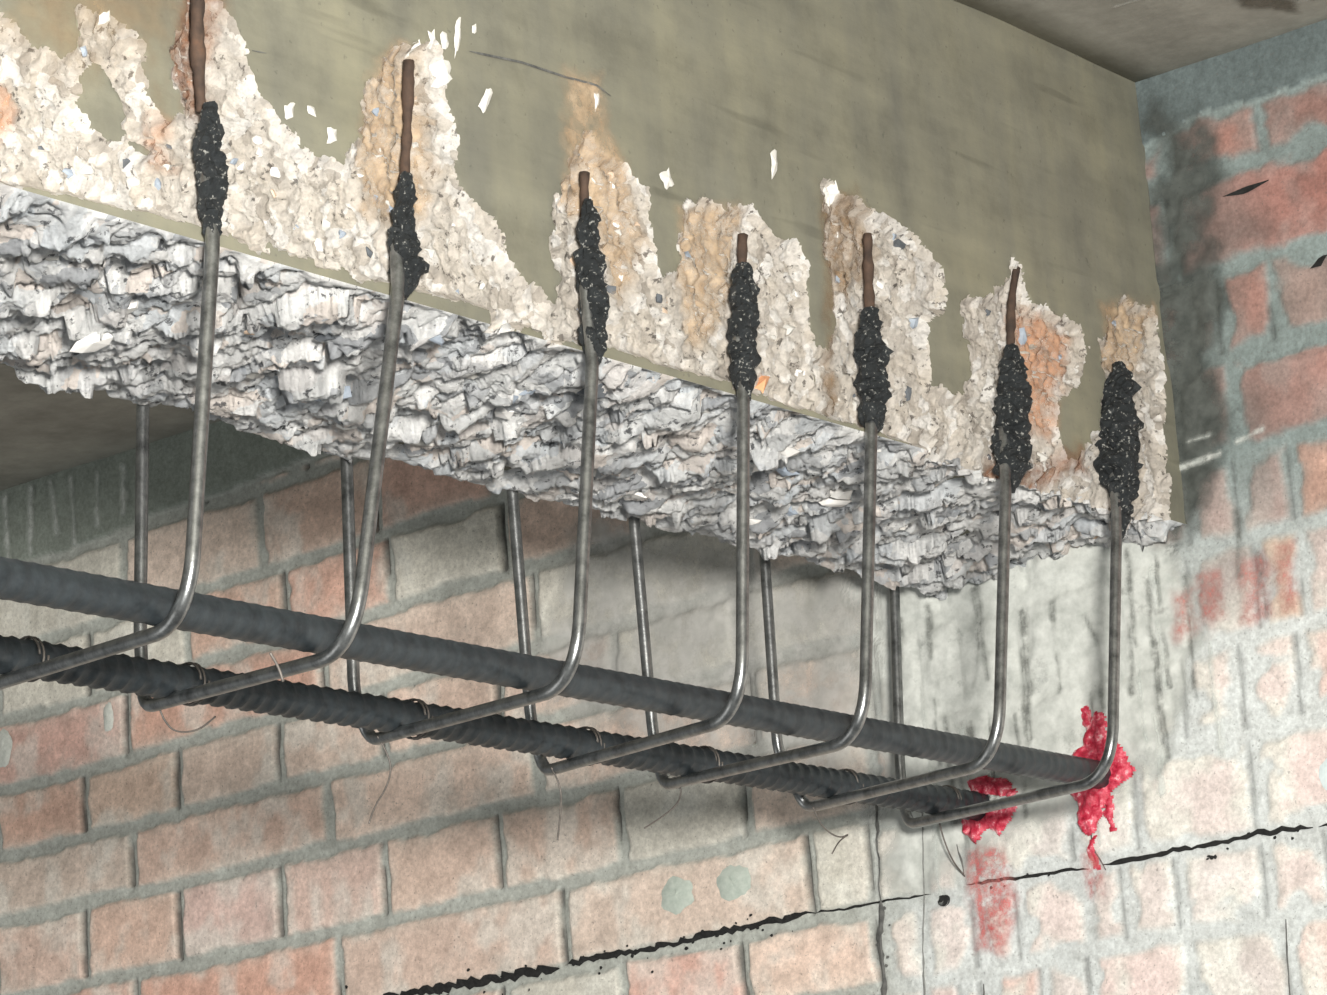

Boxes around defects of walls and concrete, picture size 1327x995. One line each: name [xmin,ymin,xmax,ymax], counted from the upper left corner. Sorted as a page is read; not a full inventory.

corrosion [172,0,210,106]
corrosion [560,81,634,293]
corrosion [680,210,739,337]
corrosion [1015,320,1065,433]
water stain [1146,107,1243,537]
spalling [0,0,1187,877]
corrosion [1021,454,1082,489]
water stain [1129,641,1171,696]
crack [383,805,929,995]
crack [956,823,1327,889]
crack [1284,923,1292,995]